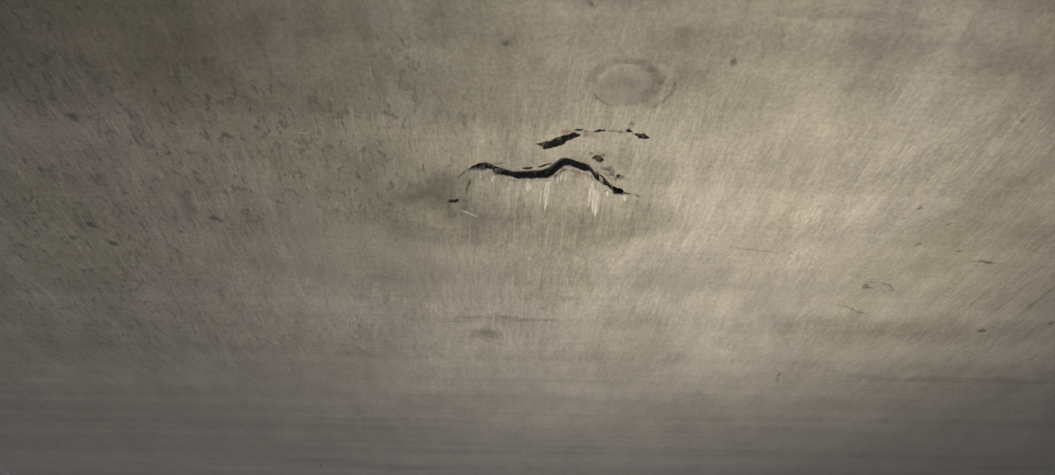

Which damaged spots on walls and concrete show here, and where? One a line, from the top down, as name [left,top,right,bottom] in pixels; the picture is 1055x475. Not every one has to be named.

leakage [525,169,563,211]
crack [463,159,637,198]
leakage [588,178,627,216]